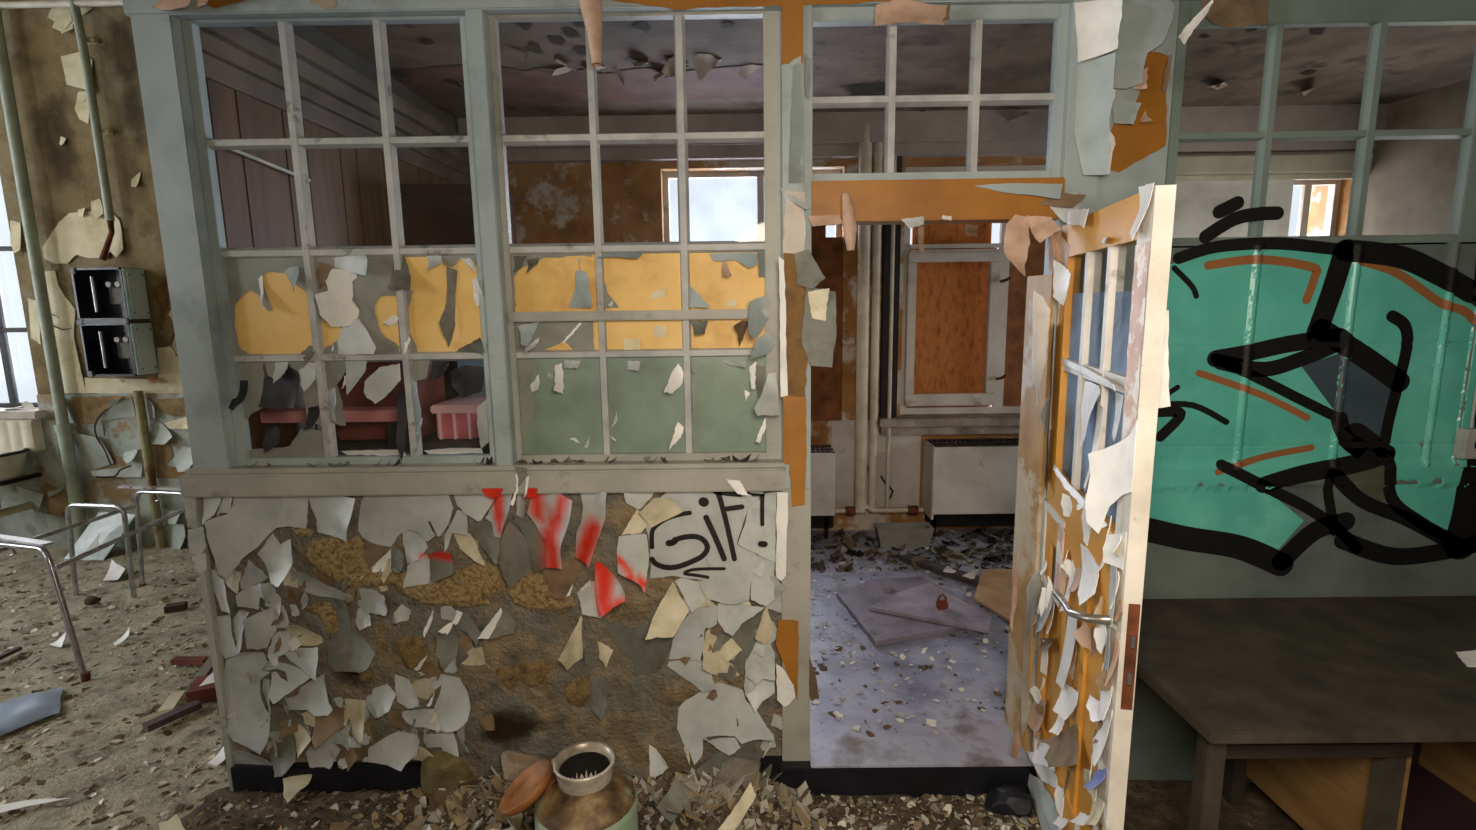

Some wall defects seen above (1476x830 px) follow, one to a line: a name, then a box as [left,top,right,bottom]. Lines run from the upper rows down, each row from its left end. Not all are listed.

peeling [48,7,93,34]
peeling [61,52,93,124]
peeling [152,0,244,10]
peeling [501,0,782,109]
peeling [803,0,950,26]
peeling [1074,0,1269,176]
peeling [10,221,21,253]
peeling [901,216,925,253]
peeling [27,199,193,479]
peeling [1158,310,1170,408]
peeling [161,54,857,803]
peeling [974,183,1154,830]